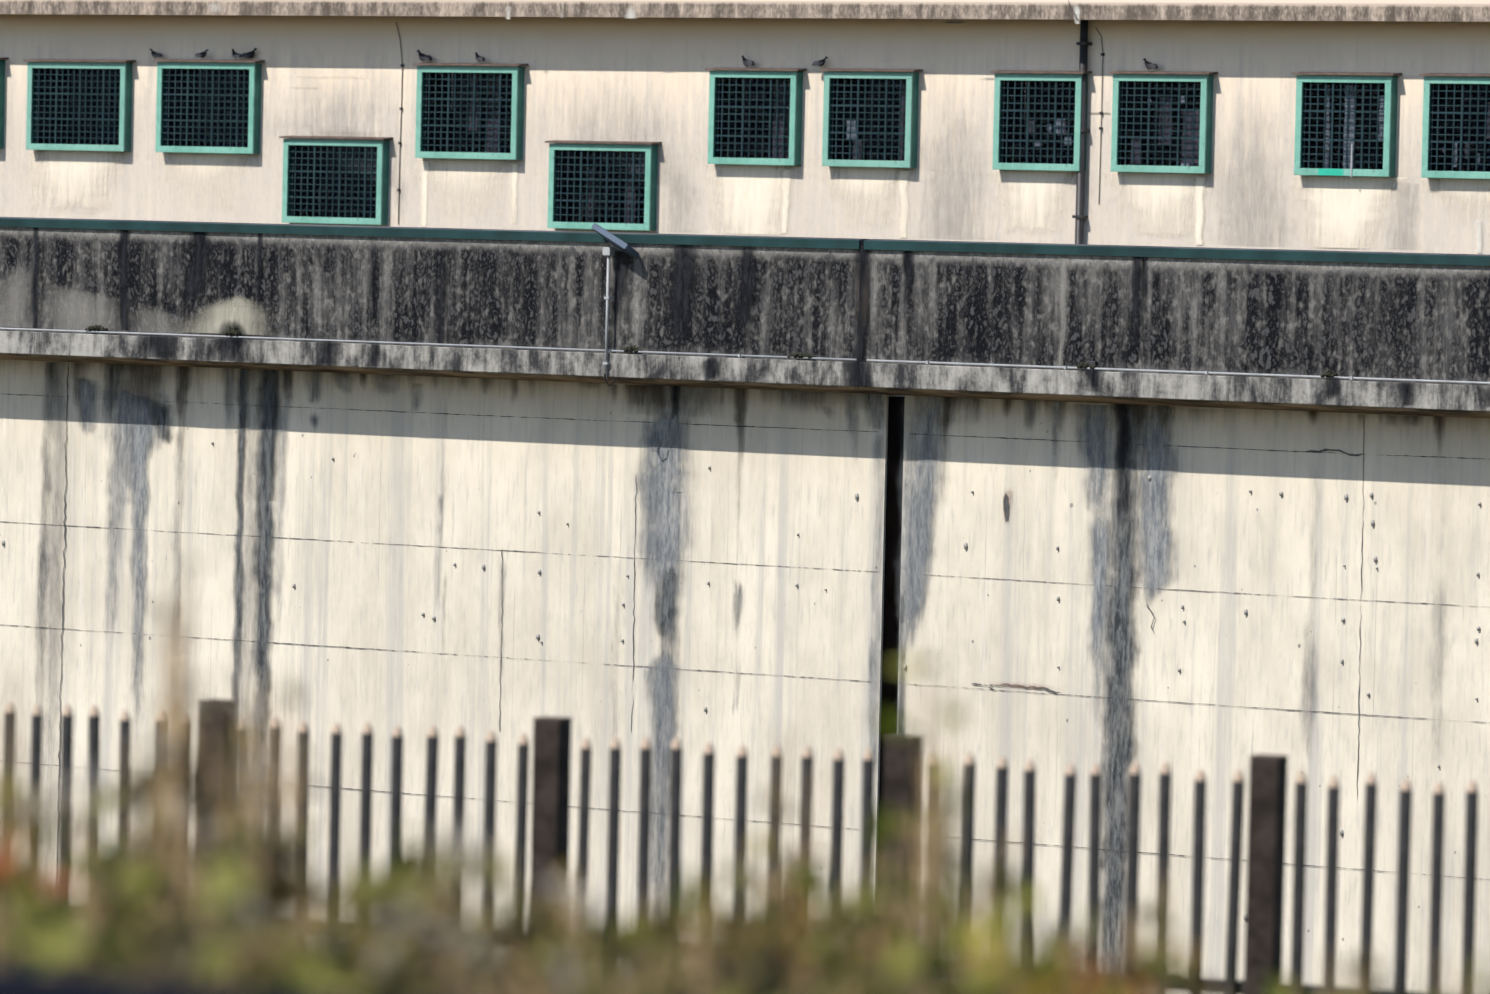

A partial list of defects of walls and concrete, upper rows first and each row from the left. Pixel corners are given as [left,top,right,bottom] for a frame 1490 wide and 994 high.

water stain [33,150,115,208]
water stain [611,251,628,319]
water stain [711,164,791,326]
water stain [853,242,869,361]
water stain [38,538,55,601]
water stain [46,362,189,682]
water stain [224,368,292,770]
water stain [612,384,713,882]
water stain [898,396,980,735]
crack [971,683,1060,693]
water stain [1004,399,1173,972]
crack [1306,424,1364,796]